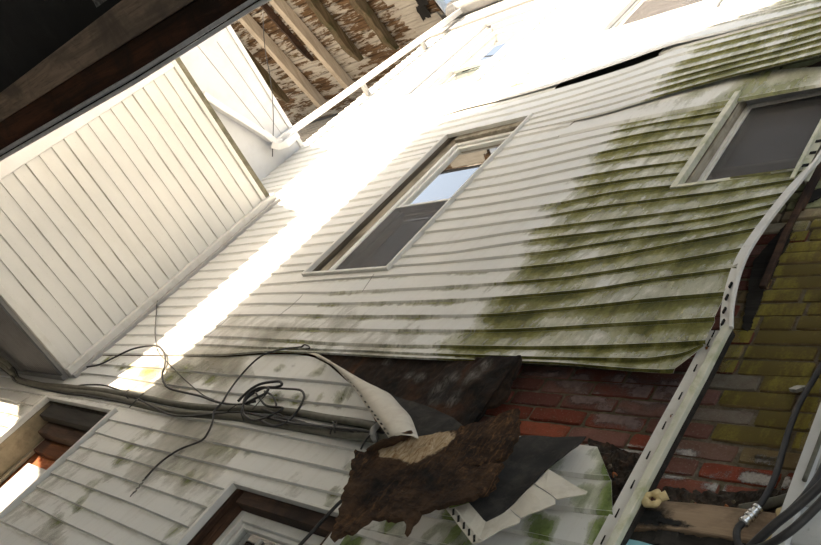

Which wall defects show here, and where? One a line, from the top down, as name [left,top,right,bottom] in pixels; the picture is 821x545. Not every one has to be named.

water stain [119,329,319,400]
water stain [432,0,821,373]